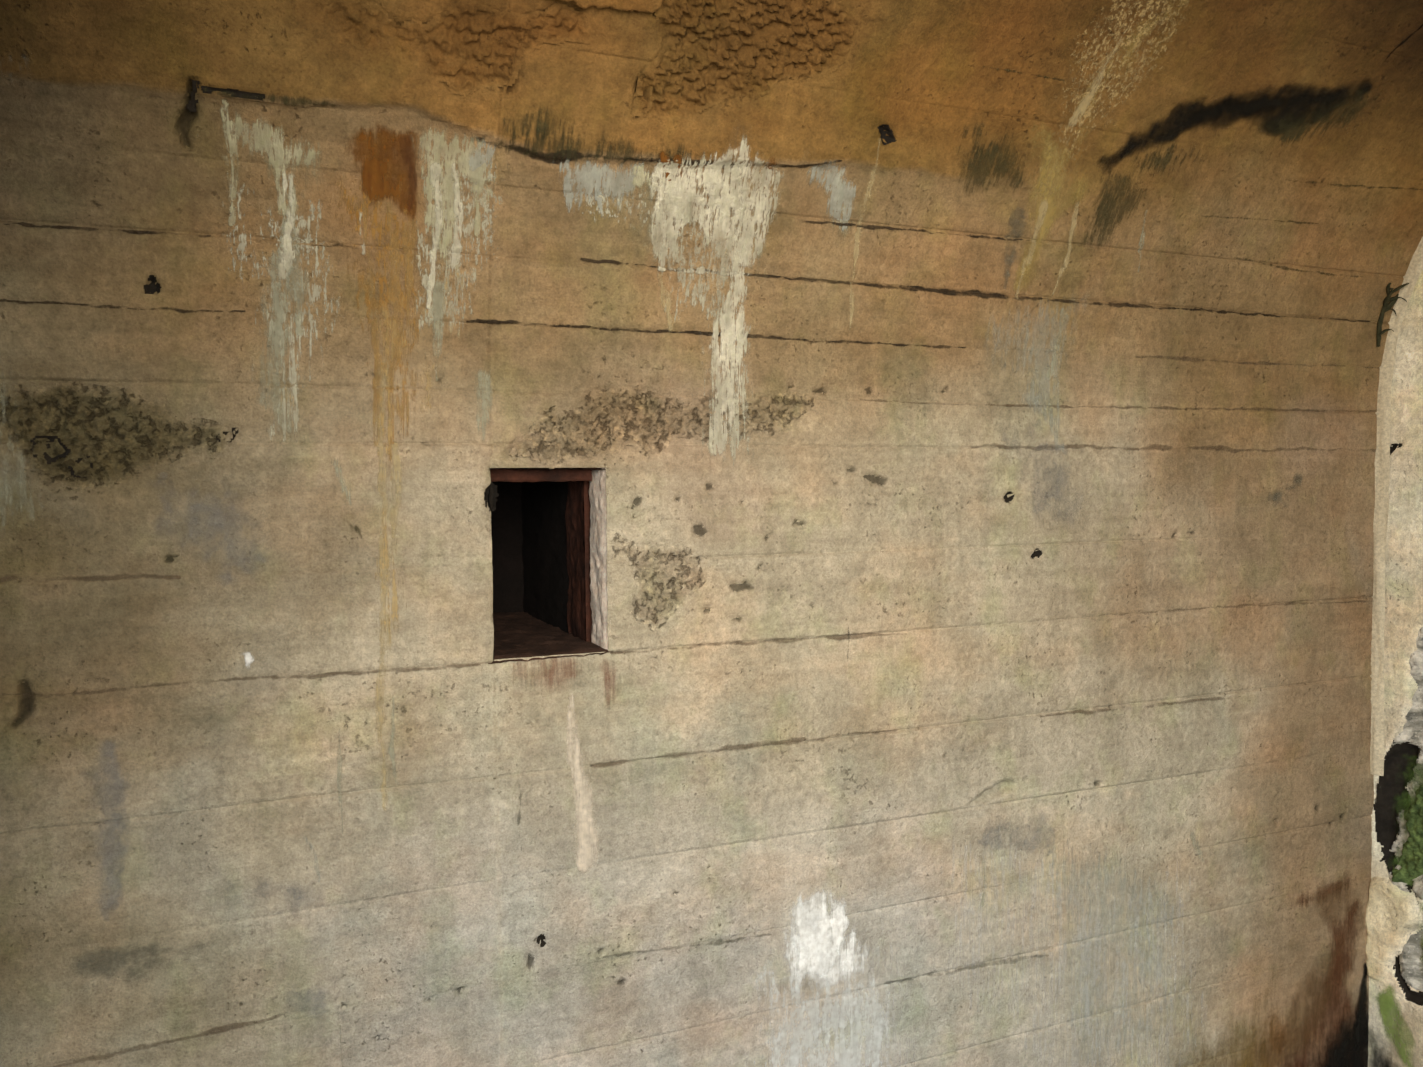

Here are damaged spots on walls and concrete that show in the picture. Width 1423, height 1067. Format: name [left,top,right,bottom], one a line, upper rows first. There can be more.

damp [204,89,339,441]
rust [338,127,432,460]
damp [412,109,782,458]
spalling [631,0,858,123]
damp [811,165,871,267]
damp [967,0,1377,286]
spalling [1388,627,1423,900]
damp [772,892,887,1067]
damp [1197,963,1391,1067]
spalling [1399,926,1423,991]